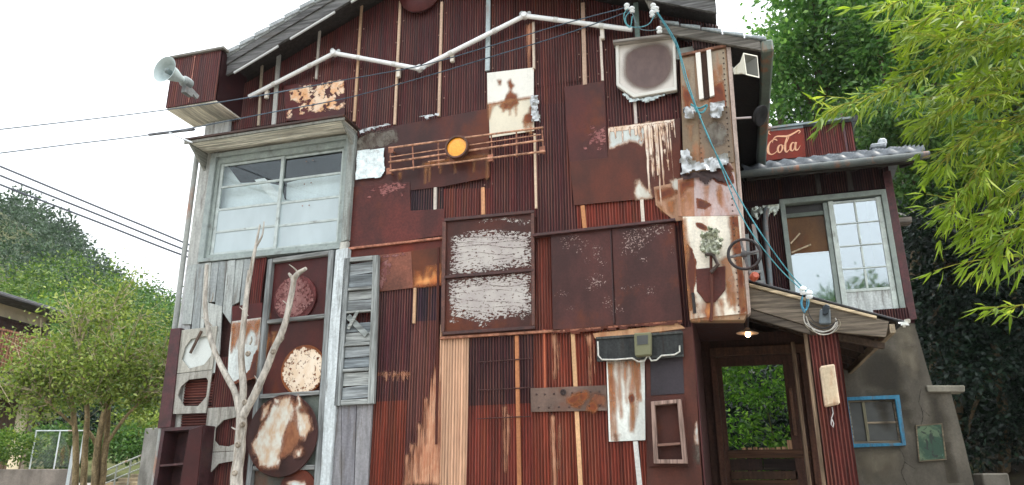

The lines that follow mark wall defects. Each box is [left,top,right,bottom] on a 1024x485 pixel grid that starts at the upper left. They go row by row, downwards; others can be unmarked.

peeling [286,80,346,119]
rust [488,80,533,132]
damp [608,121,676,206]
peeling [448,217,531,326]
rust [552,172,748,441]
peeling [261,398,281,421]
peeling [293,395,313,457]